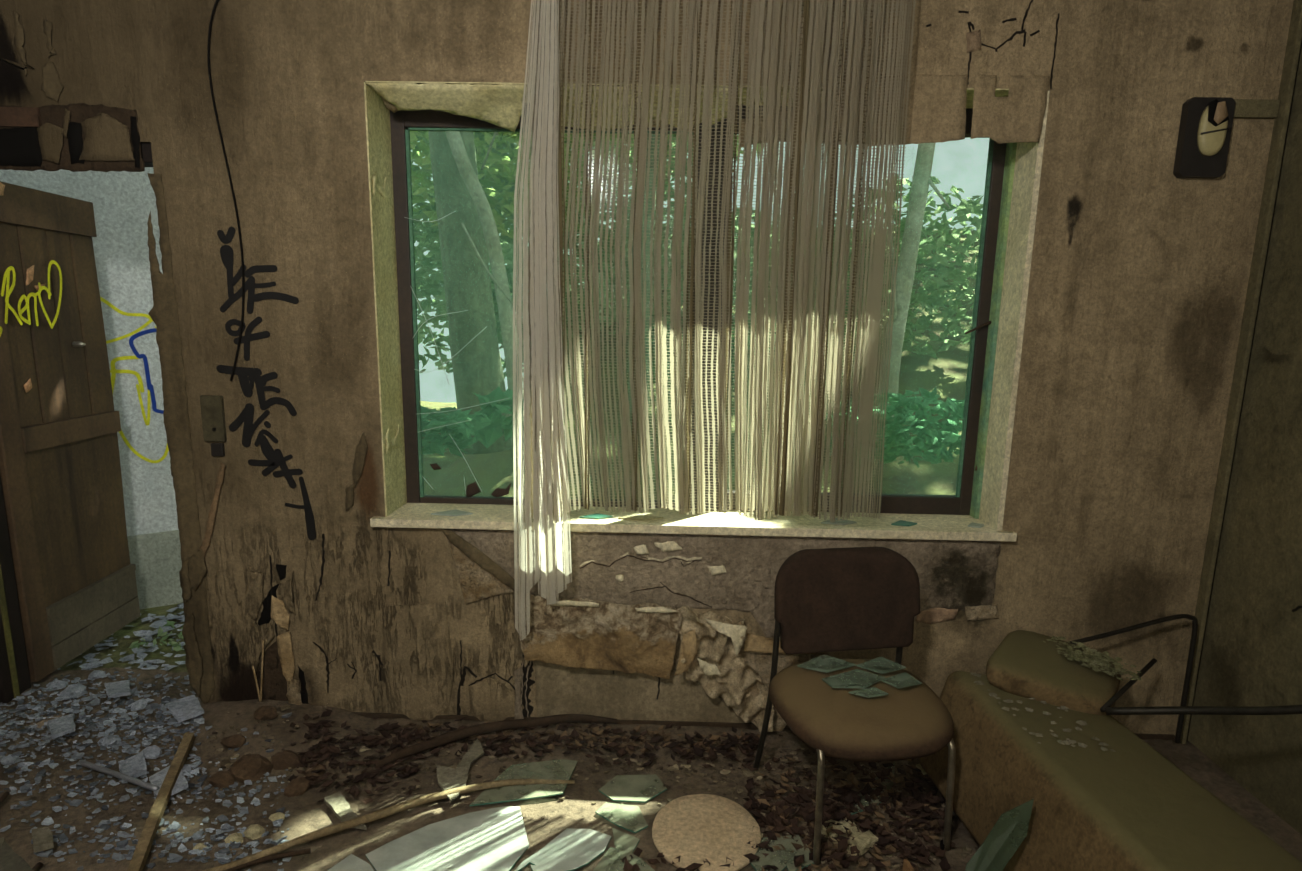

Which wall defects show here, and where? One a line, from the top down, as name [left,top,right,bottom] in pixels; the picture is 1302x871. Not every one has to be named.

peeling [0,10,135,164]
crack [926,0,1060,89]
spalling [245,564,309,705]
crack [580,552,712,608]
flaking render [450,529,1001,638]
leakage [934,557,990,623]
peeling [534,661,752,723]